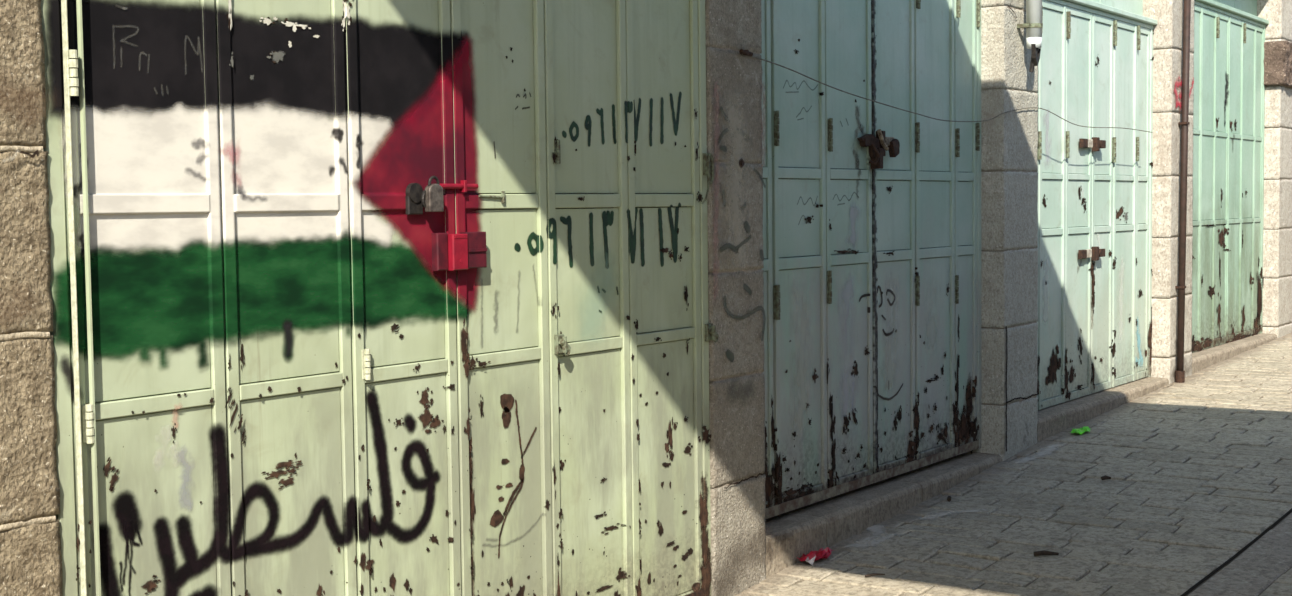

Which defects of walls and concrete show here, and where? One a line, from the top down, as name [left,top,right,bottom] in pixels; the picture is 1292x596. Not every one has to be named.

rust [490,394,537,558]